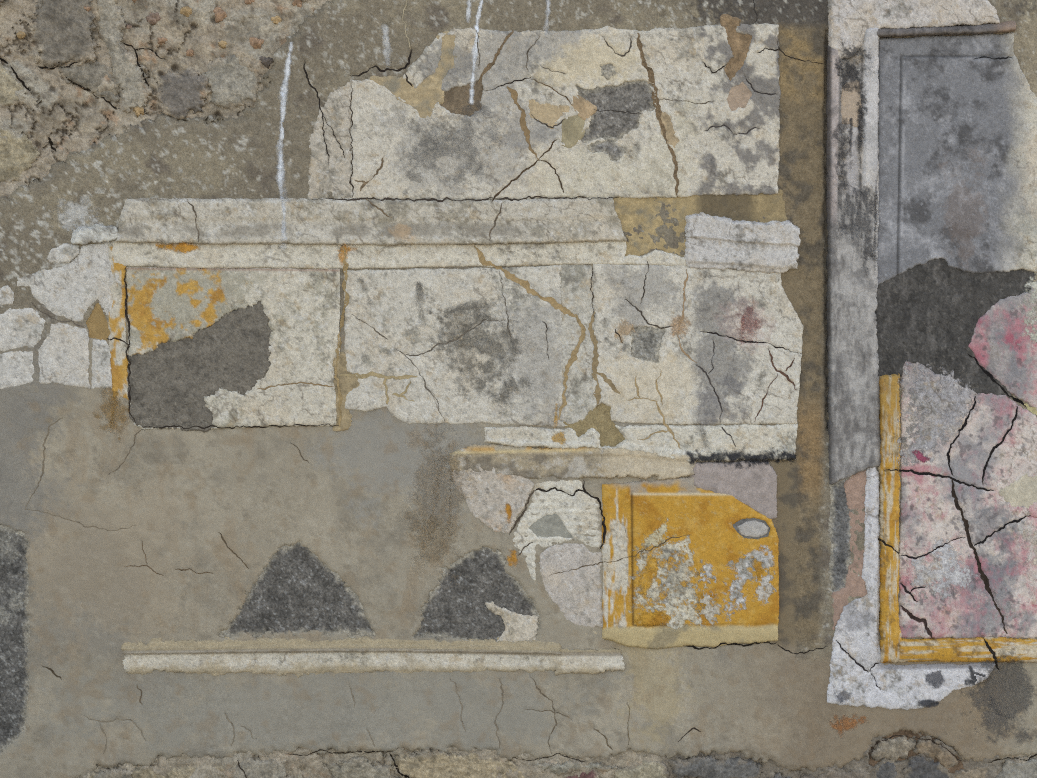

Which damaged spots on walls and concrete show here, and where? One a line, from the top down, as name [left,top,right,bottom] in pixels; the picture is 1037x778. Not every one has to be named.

damp [278,43,293,244]
crack [106,0,681,475]
damp [466,0,483,104]
spalling [528,63,680,161]
crack [596,33,760,197]
spalling [613,189,787,257]
damp [834,42,877,256]
spalling [127,301,272,432]
crack [626,261,801,447]
spalling [875,258,1037,466]
crack [878,354,1037,670]
spalling [0,525,31,752]